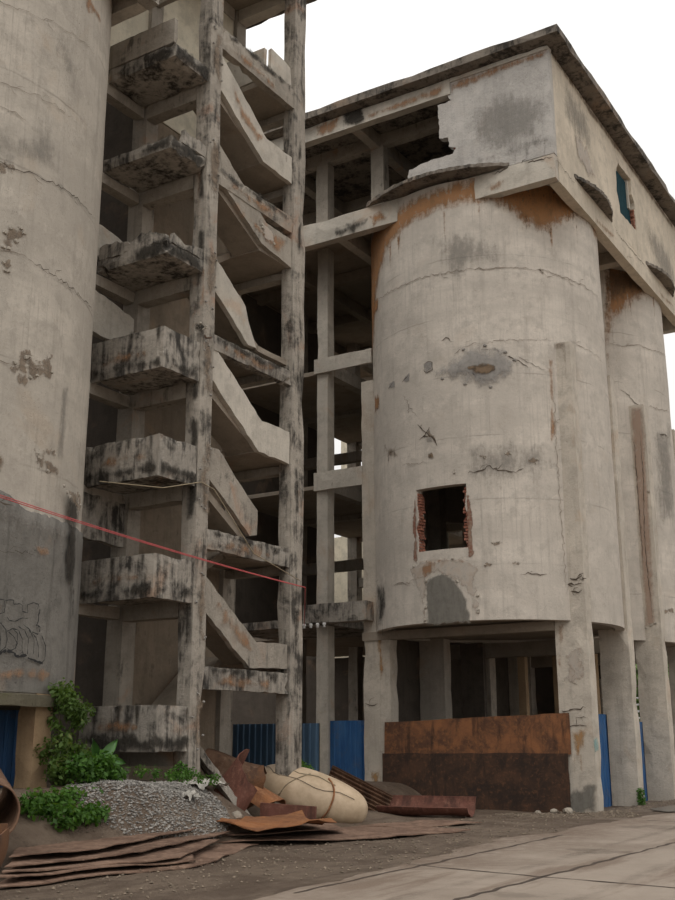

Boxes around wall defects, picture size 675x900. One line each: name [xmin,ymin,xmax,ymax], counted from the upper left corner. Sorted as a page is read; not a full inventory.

crack [0,161,95,219]
spalling [1,226,26,273]
crack [0,250,92,311]
crack [380,267,593,298]
spalling [10,349,54,385]
crack [441,337,663,595]
water stain [426,575,469,625]